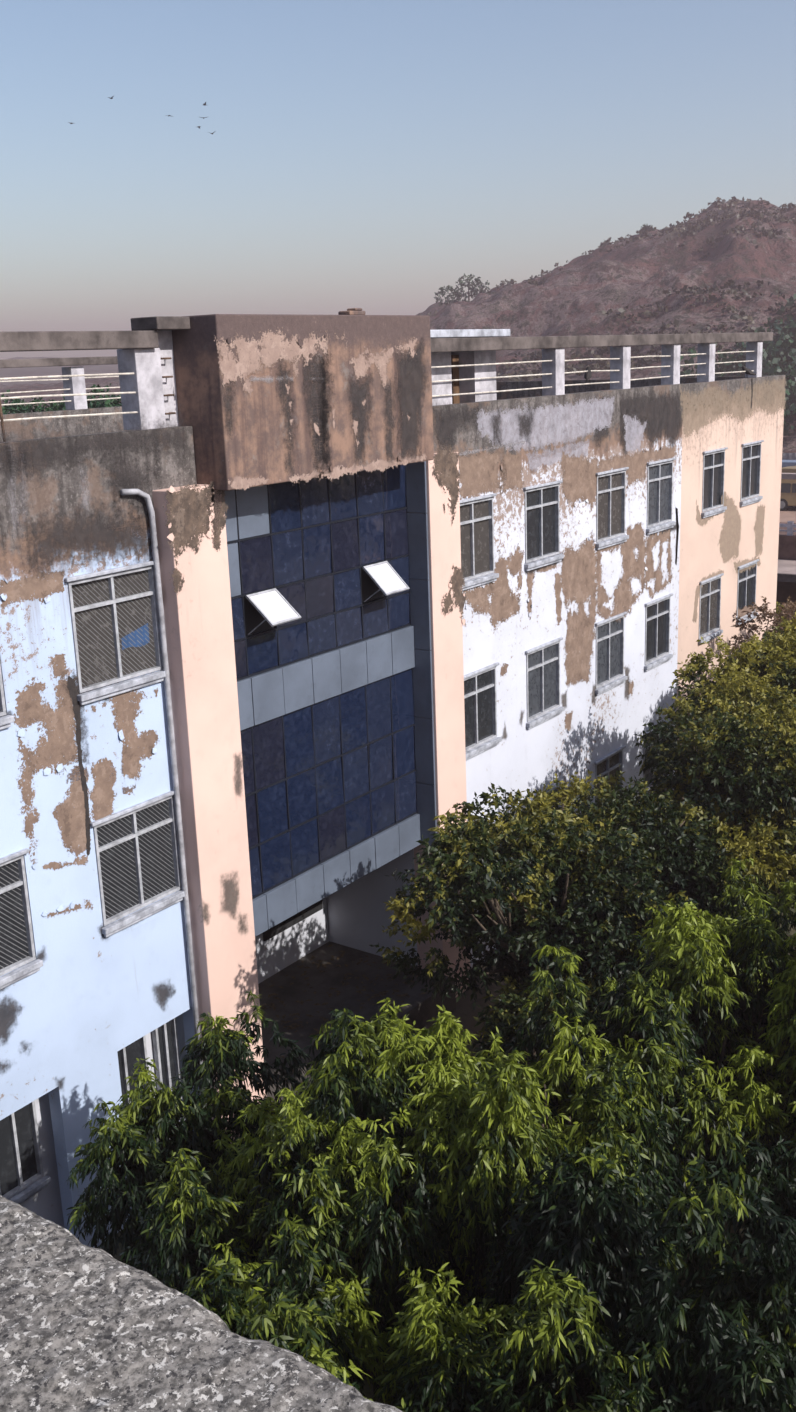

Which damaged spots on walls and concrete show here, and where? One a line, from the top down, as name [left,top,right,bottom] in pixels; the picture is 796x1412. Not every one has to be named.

water stain [278,357,330,469]
peeling [214,327,417,441]
water stain [350,343,501,461]
water stain [518,409,533,445]
water stain [591,375,786,453]
water stain [0,423,187,572]
peeling [163,396,676,593]
peeling [0,571,65,609]
peeling [441,522,673,686]
crack [67,676,91,855]
peeling [14,653,161,872]
peeling [564,711,574,732]